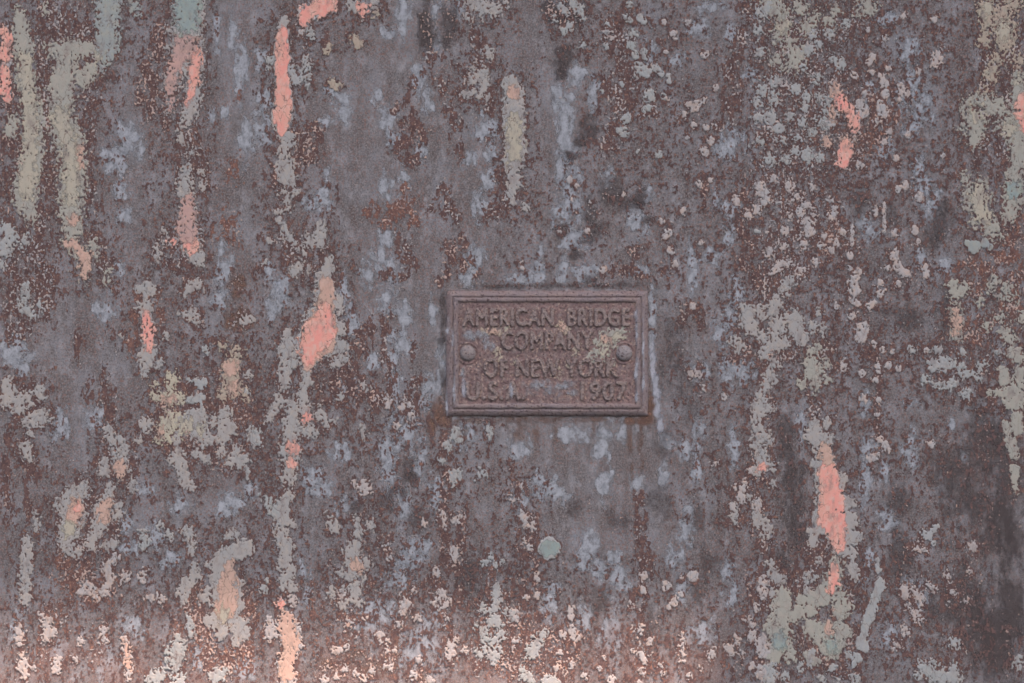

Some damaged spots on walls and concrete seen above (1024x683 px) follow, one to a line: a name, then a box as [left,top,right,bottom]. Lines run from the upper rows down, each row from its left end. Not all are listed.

rust [0,0,263,683]
rust [361,0,513,348]
rust [553,184,651,259]
rust [541,0,691,165]
rust [603,241,672,286]
rust [659,302,713,374]
rust [701,0,902,320]
rust [967,0,1024,171]
rust [301,299,600,683]
rust [606,475,688,677]
peeling [614,554,746,630]
peeling [865,472,905,532]